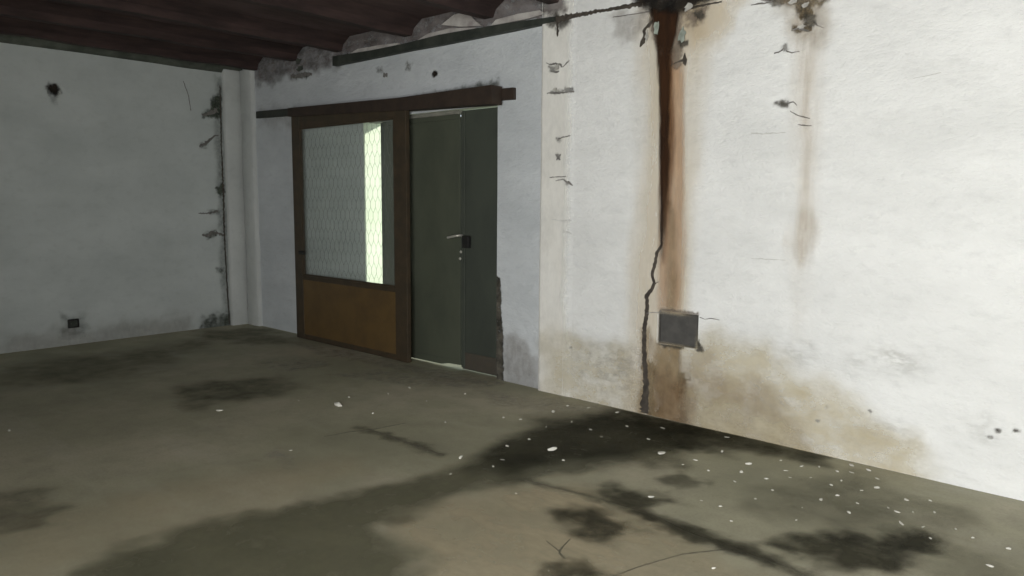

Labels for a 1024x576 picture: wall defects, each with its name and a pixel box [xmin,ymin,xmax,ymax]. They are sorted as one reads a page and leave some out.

spalling [639,17,659,47]
spalling [670,2,725,69]
spalling [752,0,825,33]
hole [46,84,60,96]
rust [651,9,683,311]
leakage [201,314,229,329]
crack [638,200,663,414]
rust [650,345,683,422]
leakage [79,347,914,576]